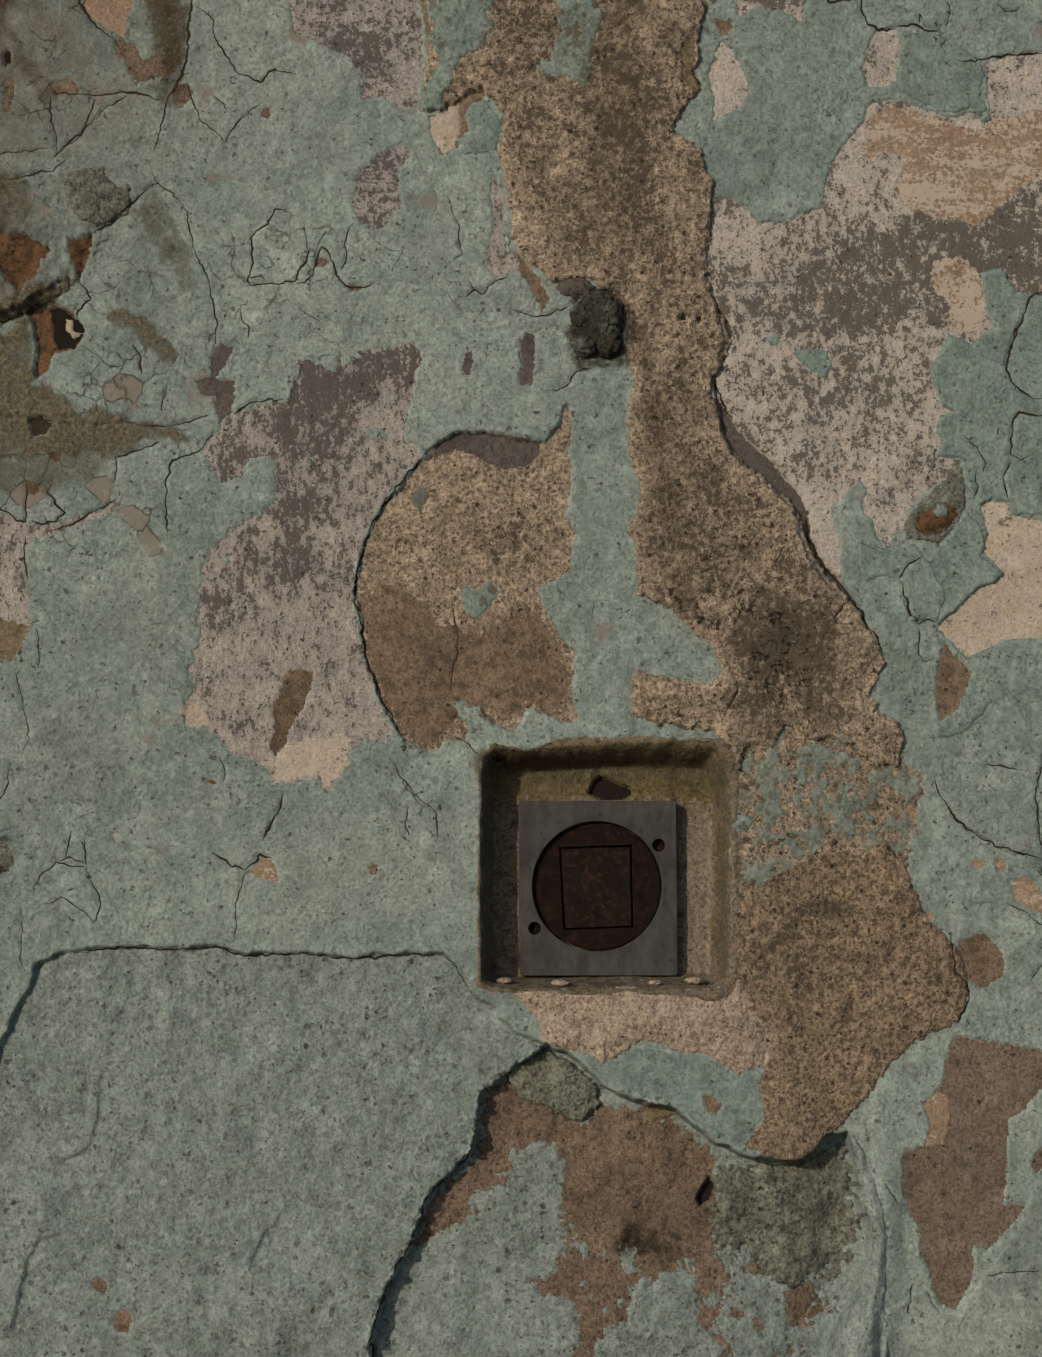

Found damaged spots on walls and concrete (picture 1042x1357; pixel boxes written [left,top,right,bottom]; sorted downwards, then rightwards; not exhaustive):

damp [147,0,186,101]
crack [1,0,378,355]
crack [0,620,40,799]
spalling [30,305,85,378]
peeling [0,496,126,663]
damp [0,284,188,491]
crack [0,281,282,579]
peeling [179,342,578,791]
spalling [286,0,1042,767]
spalling [0,724,1005,1357]
crack [368,1124,477,1357]
peeling [881,1035,1042,1357]